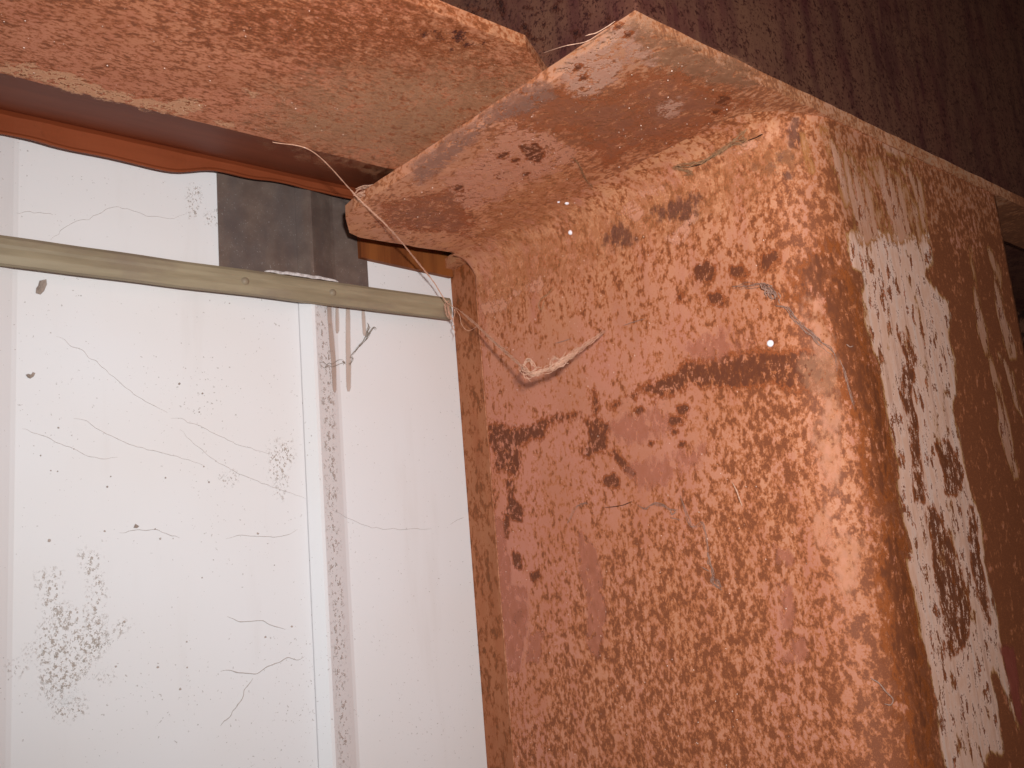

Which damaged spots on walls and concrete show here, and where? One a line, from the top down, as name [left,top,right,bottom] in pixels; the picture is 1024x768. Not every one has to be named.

corrosion [417,29,485,50]
corrosion [573,63,590,81]
corrosion [482,143,546,180]
corrosion [752,117,801,178]
corrosion [604,225,636,246]
corrosion [654,193,701,221]
water stain [327,306,366,392]
peeling [809,124,1024,768]
corrosion [488,237,935,768]
corrosion [897,331,991,659]
mould [42,573,102,690]
corrosion [1000,645,1022,724]